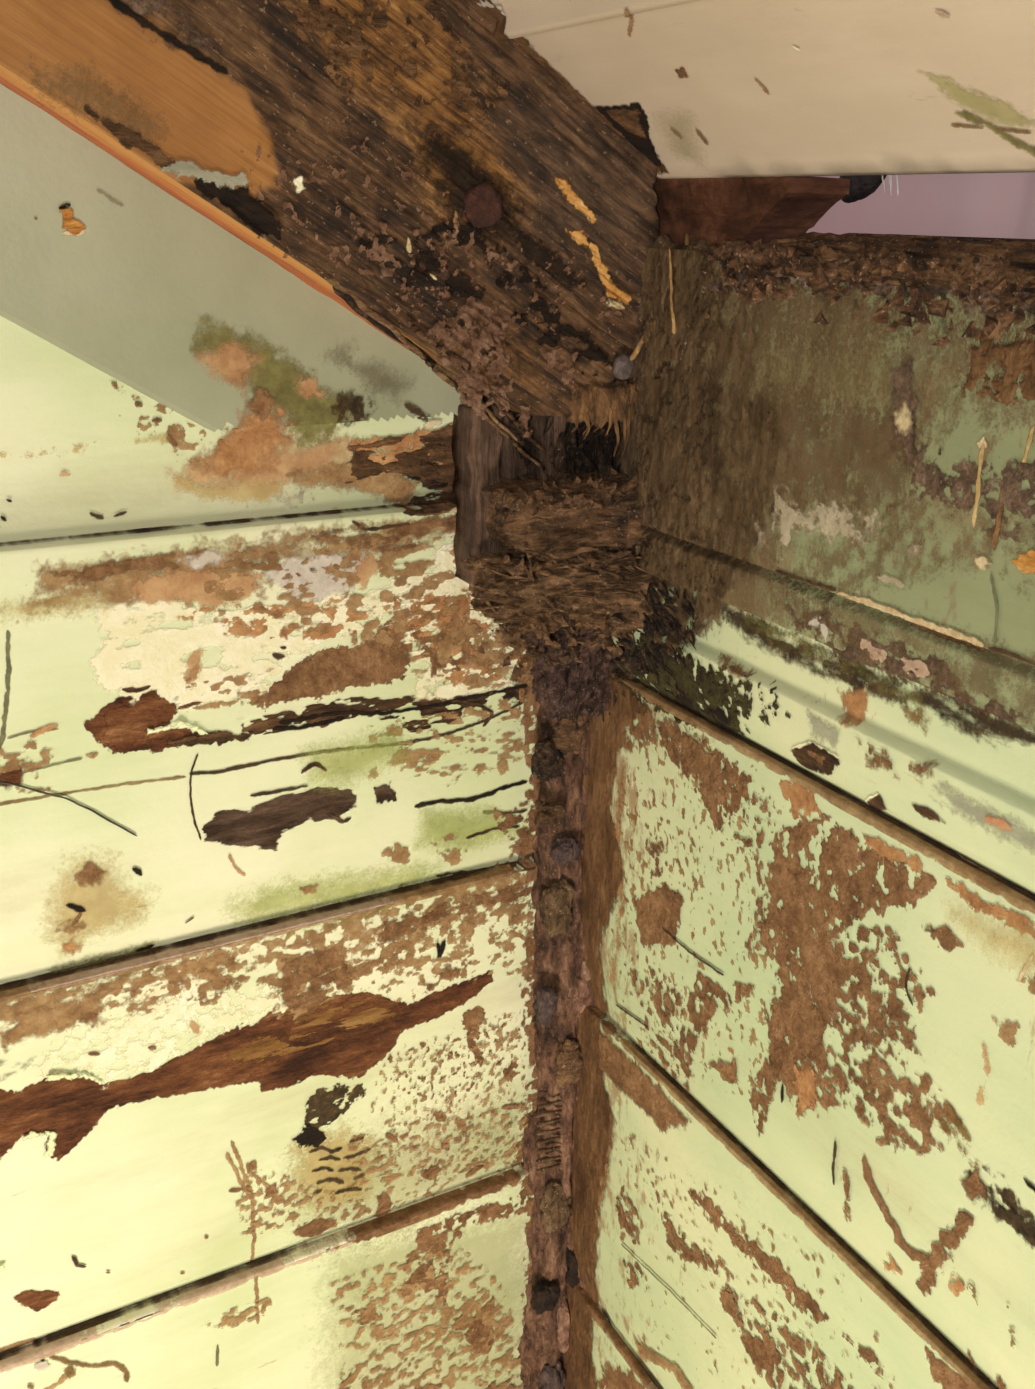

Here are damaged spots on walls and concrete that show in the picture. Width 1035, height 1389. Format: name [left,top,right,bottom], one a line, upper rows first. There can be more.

damp [707,409,1035,724]
peeling [84,685,207,758]
crack [0,630,528,840]
peeling [202,785,357,876]
peeling [374,781,397,804]
crack [381,757,535,877]
crack [299,884,319,895]
peeling [0,970,493,1161]
peeling [14,1290,60,1312]